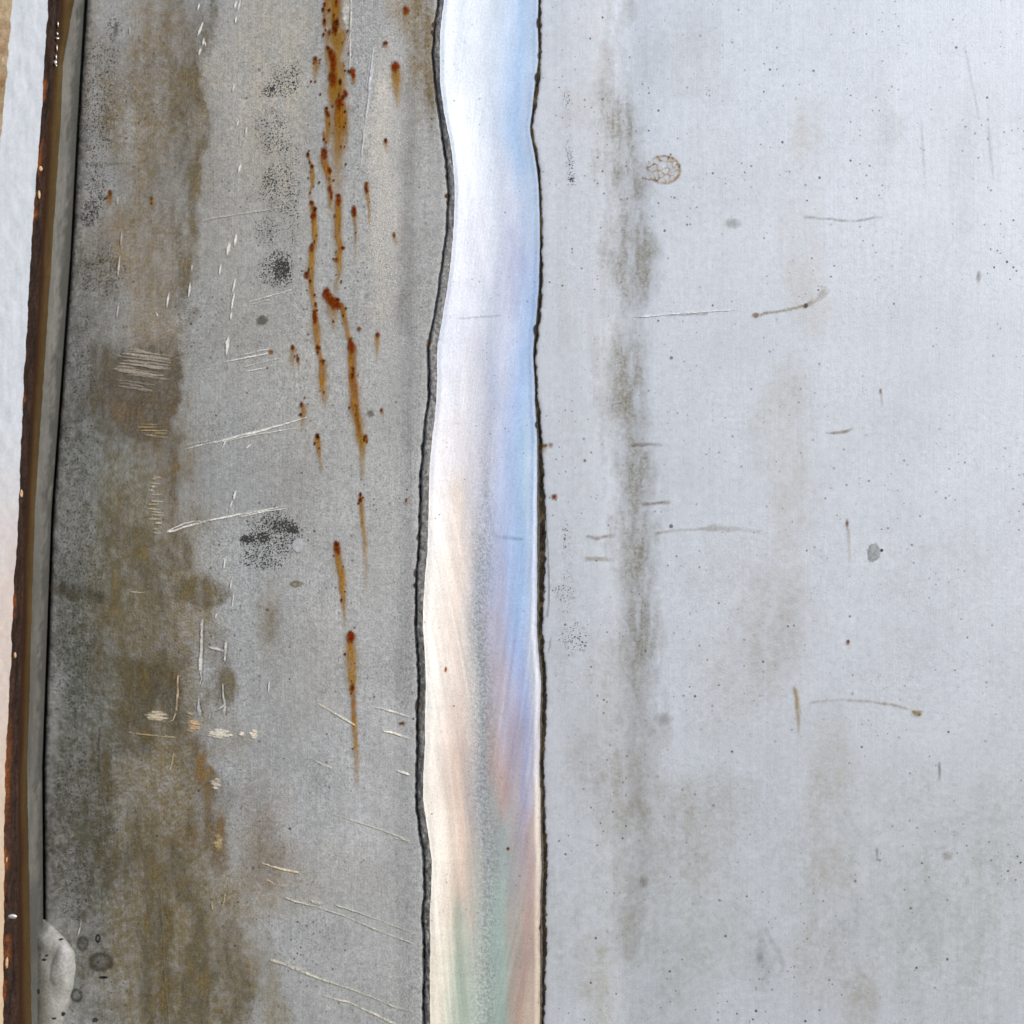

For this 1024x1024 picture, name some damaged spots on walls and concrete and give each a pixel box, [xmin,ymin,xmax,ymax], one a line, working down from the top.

corrosion [0,0,12,137]
corrosion [304,0,370,455]
damp [615,353,639,423]
corrosion [333,541,346,610]
corrosion [344,627,358,750]
damp [91,934,112,970]